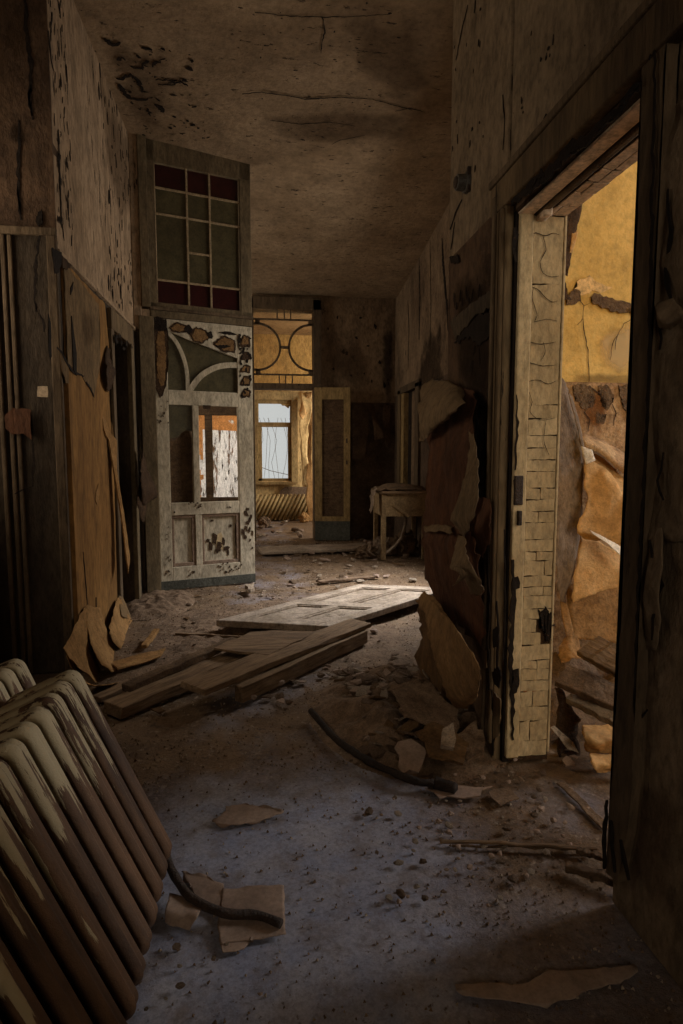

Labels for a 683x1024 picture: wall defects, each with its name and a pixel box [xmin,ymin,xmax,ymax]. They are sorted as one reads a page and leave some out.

crack [255,12,390,50]
flaking render [98,38,210,207]
crack [243,92,423,144]
flaking render [108,222,133,311]
flaking render [564,282,631,313]
crack [518,50,674,756]
peeling [482,529,520,756]